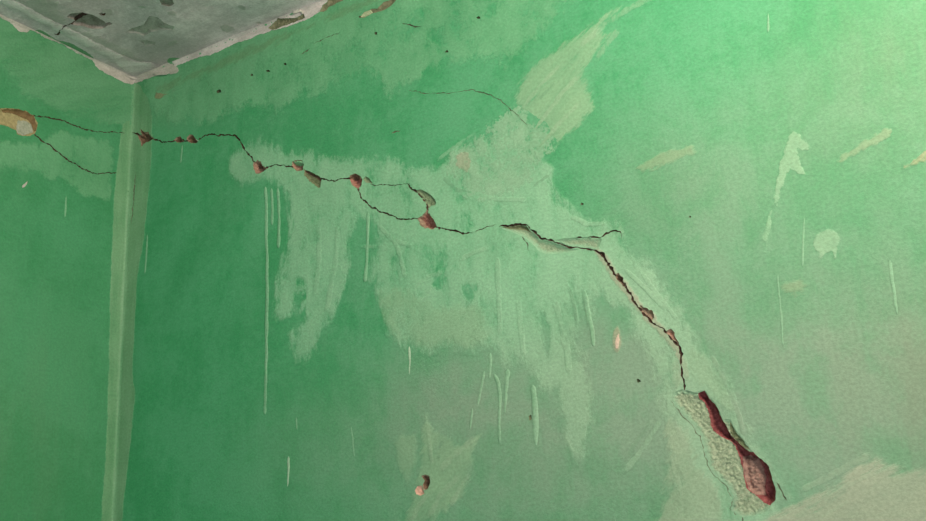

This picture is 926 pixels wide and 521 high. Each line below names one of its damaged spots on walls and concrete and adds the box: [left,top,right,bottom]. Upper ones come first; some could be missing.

spalling [0,108,38,136]
crack [409,89,527,125]
crack [34,115,293,220]
spalling [417,189,437,229]
crack [321,177,743,521]
spalling [673,389,777,517]
spalling [415,474,430,496]